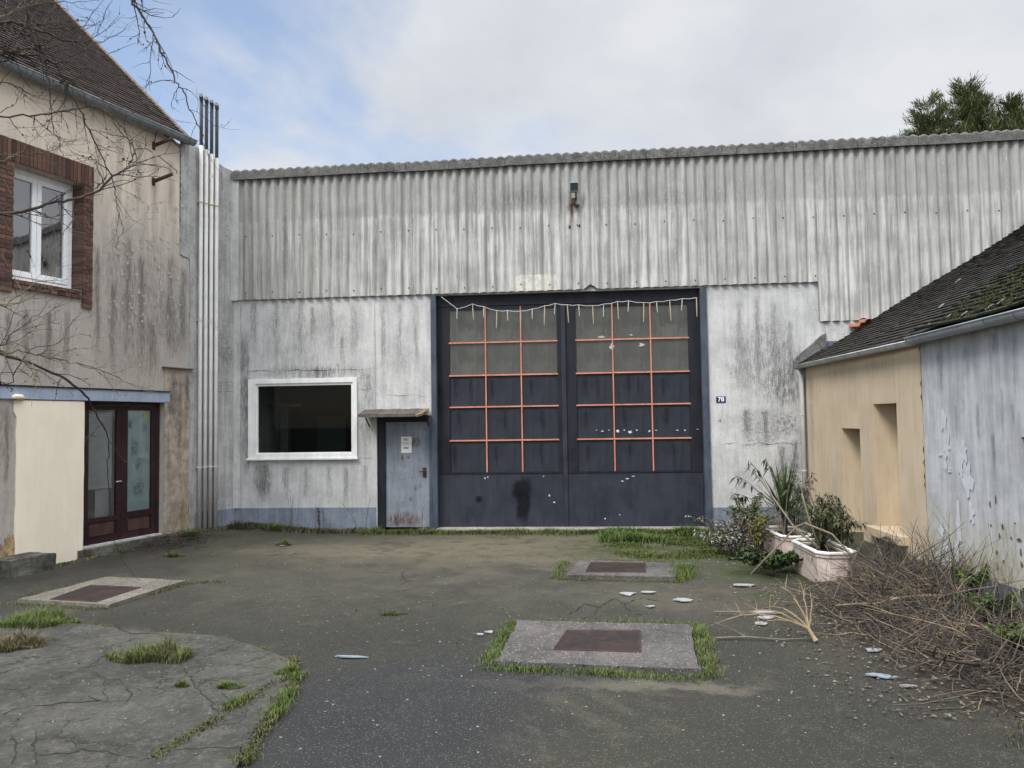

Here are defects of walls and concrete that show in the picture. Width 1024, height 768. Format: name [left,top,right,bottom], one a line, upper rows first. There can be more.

peeling [938,409,1023,581]
crack [3,621,240,764]